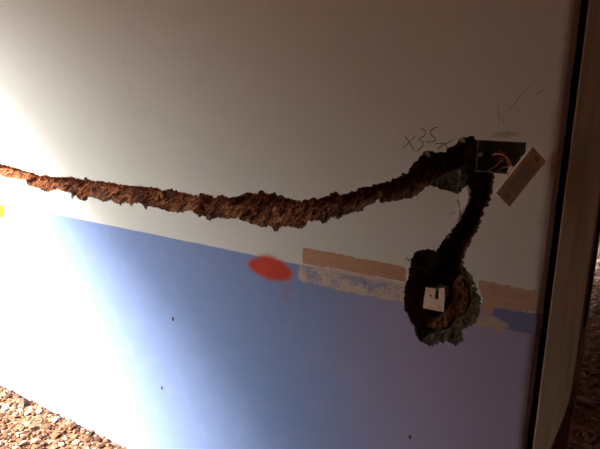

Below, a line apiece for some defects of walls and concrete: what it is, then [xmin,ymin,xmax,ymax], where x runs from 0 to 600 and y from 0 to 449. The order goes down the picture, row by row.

crack [449,188,469,229]
spalling [298,247,538,347]